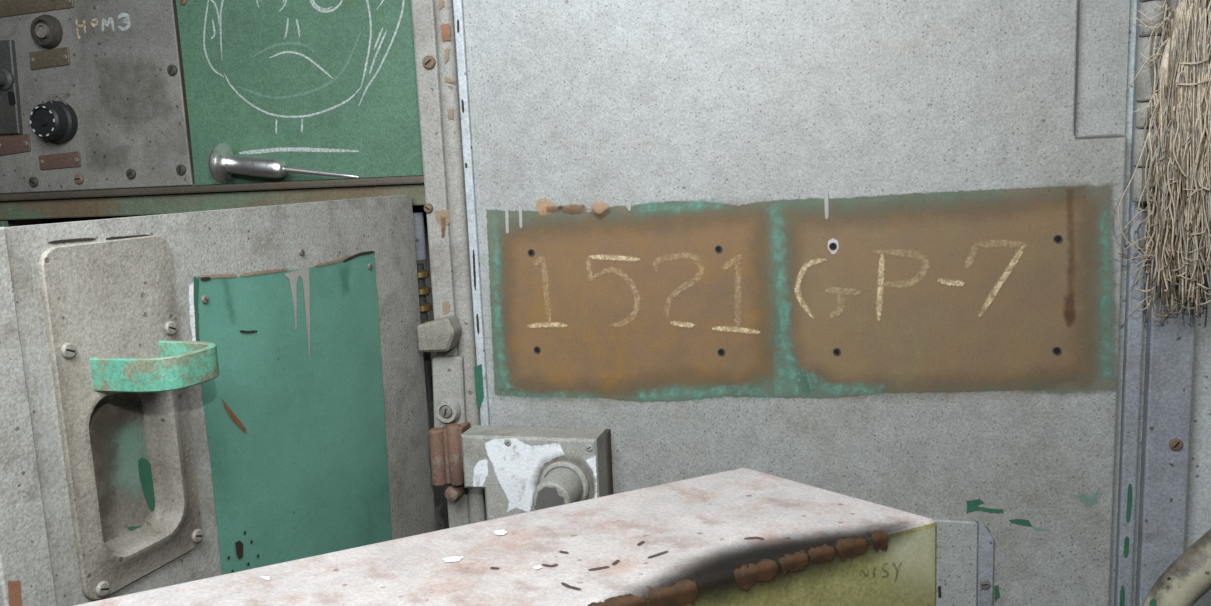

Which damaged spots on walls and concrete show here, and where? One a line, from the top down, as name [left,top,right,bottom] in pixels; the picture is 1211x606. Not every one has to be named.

rust [536,200,610,219]